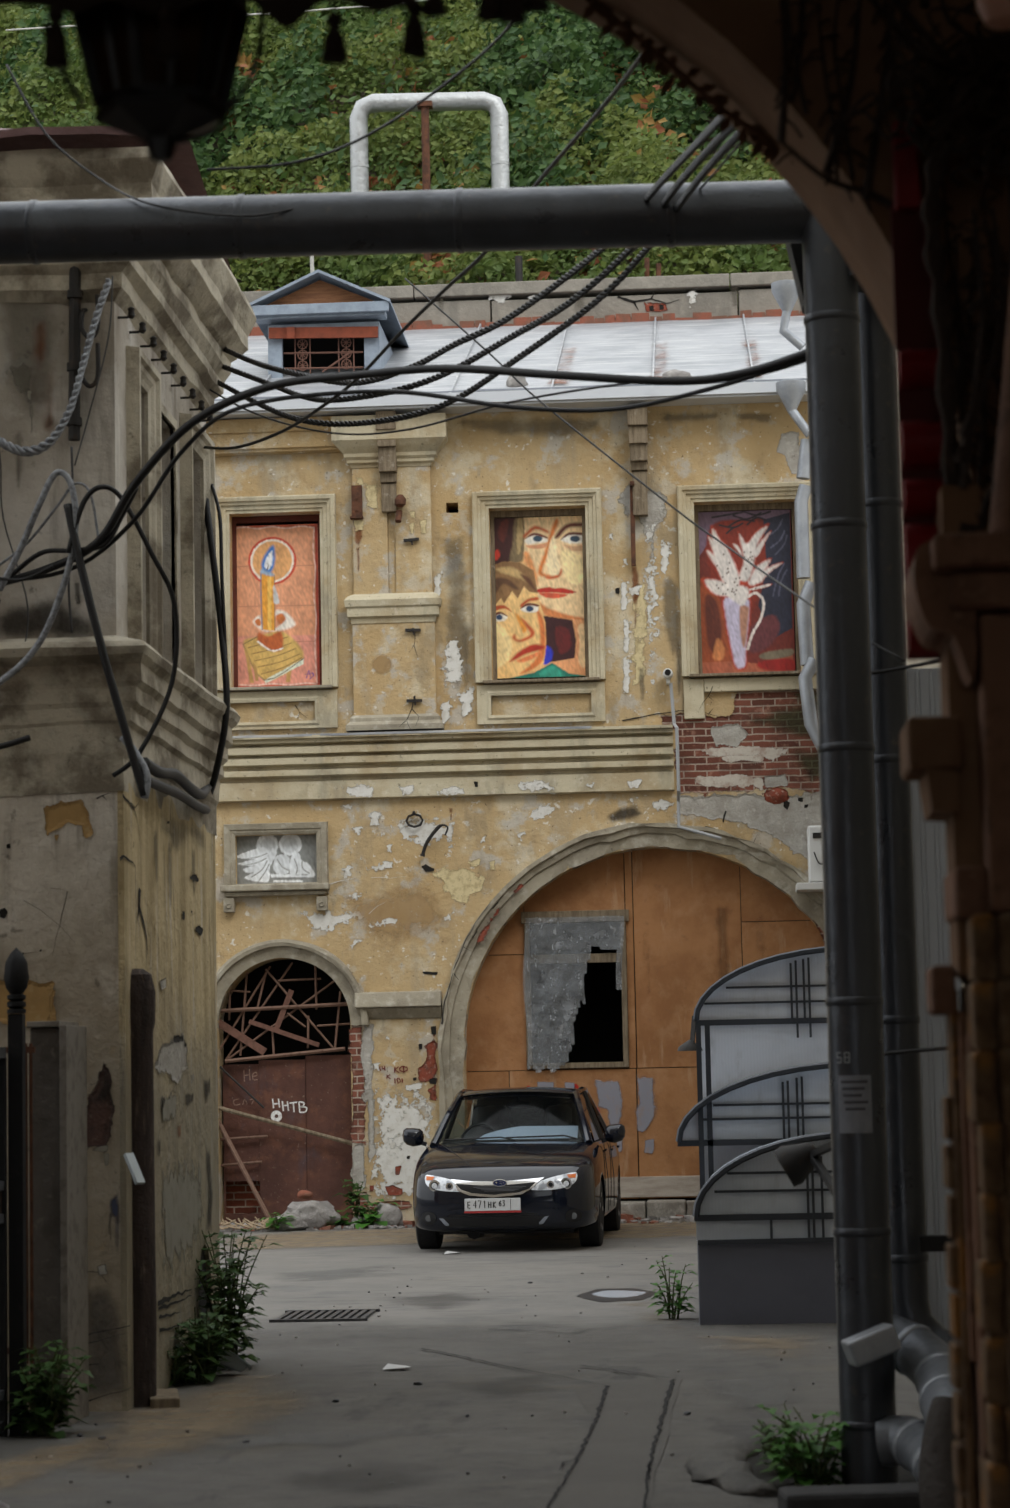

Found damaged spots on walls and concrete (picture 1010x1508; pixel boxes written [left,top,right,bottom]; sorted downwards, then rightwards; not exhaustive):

peeling [434,571,444,596]
peeling [615,485,672,696]
peeling [440,637,475,723]
peeling [44,799,94,841]
peeling [514,780,555,841]
flaking render [627,689,821,859]
spalling [87,1064,115,1166]
peeling [348,1024,438,1209]